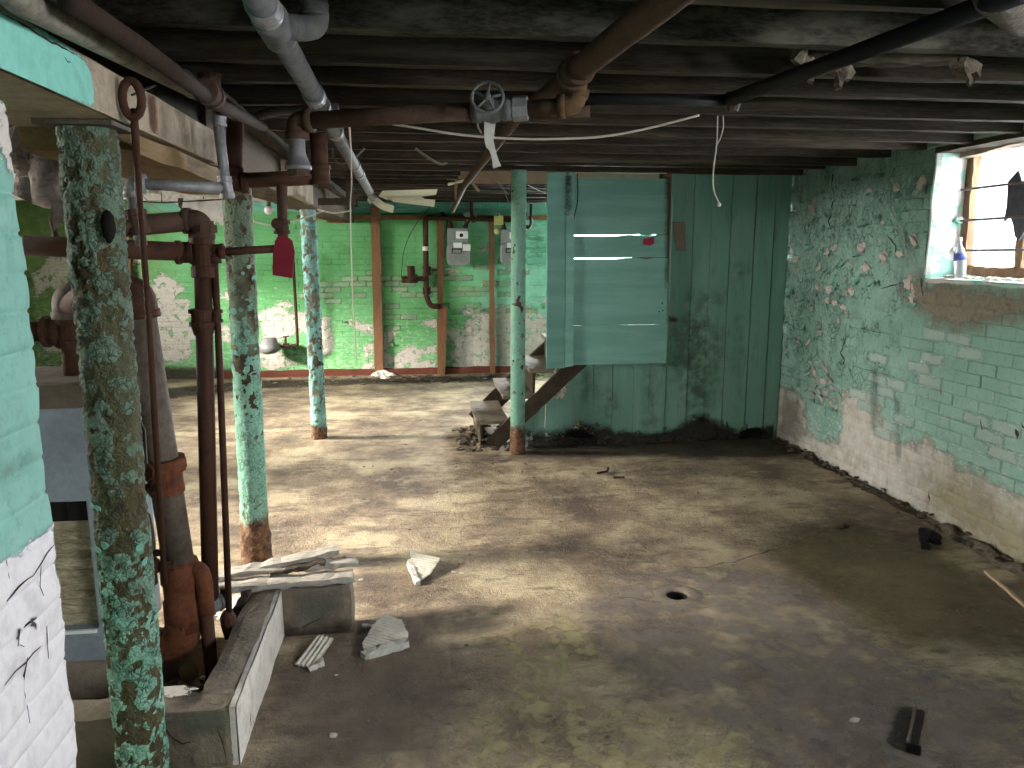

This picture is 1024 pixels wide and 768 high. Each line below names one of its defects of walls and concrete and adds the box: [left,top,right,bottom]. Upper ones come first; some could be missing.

peeling [149,272,196,363]
peeling [220,244,511,388]
peeling [525,299,546,356]
peeling [775,232,1024,564]
crack [6,545,54,602]
peeling [126,543,148,566]
crack [5,621,49,723]